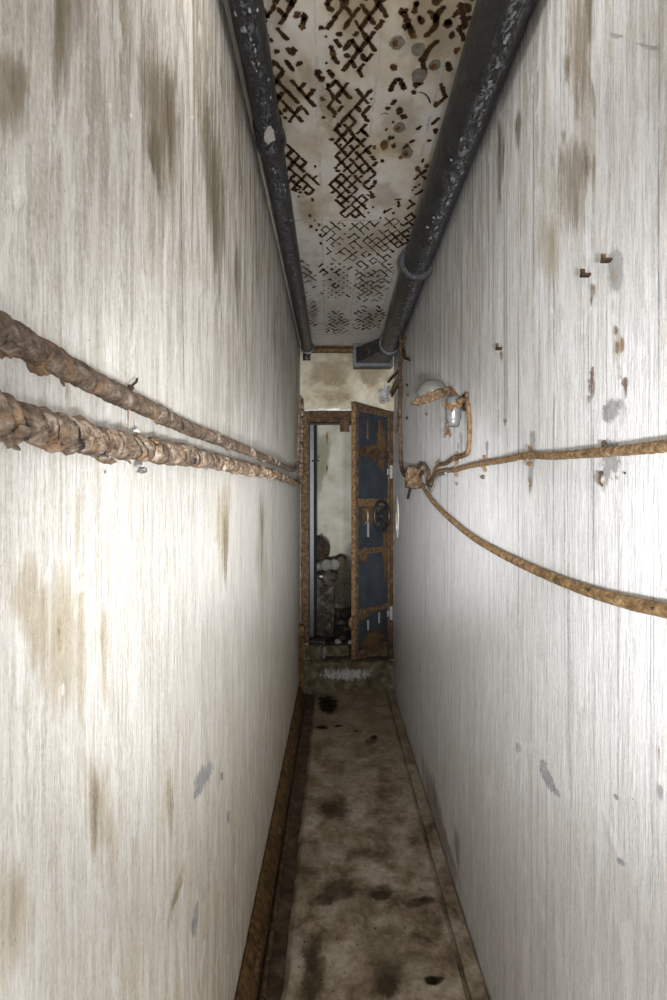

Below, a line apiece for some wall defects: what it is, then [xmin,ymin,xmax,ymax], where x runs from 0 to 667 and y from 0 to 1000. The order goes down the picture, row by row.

water stain [150,134,162,194]
rust [265,0,474,334]
water stain [200,97,240,318]
peeling [603,398,623,423]
water stain [316,694,342,729]
water stain [318,799,348,819]
water stain [317,880,355,905]
water stain [369,885,393,900]
water stain [407,897,435,908]
water stain [372,962,401,999]
water stain [425,976,443,985]